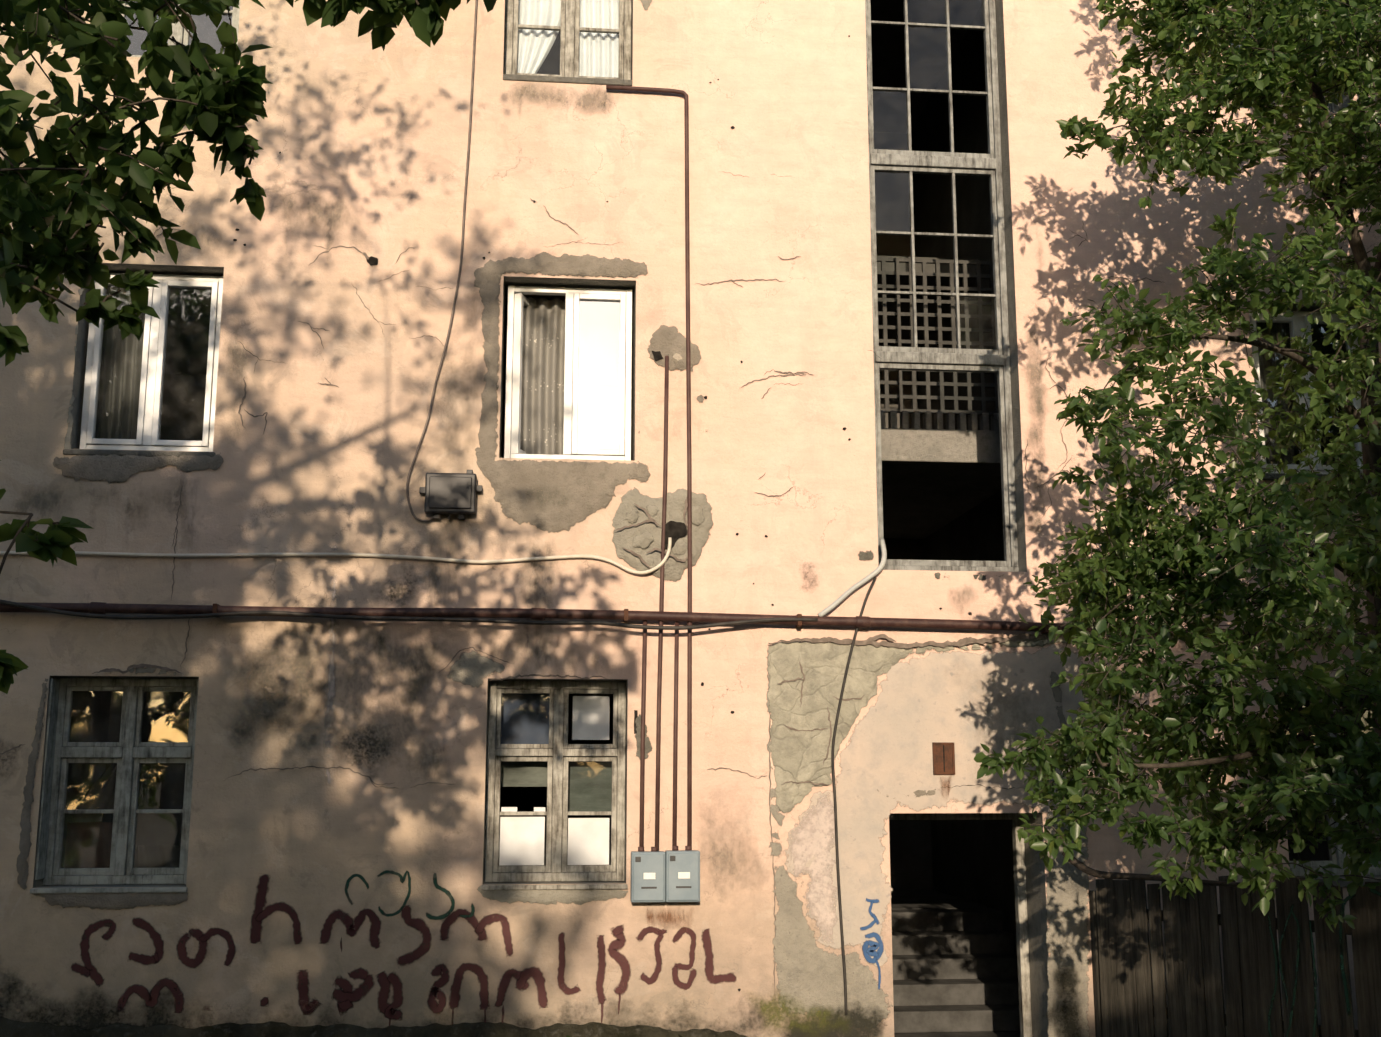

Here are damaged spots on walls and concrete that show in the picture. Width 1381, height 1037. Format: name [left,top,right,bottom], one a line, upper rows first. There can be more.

crack [309,245,362,265]
crack [353,247,453,344]
crack [699,256,801,287]
crack [238,341,270,434]
crack [299,321,338,387]
crack [741,370,813,399]
peeling [447,651,505,688]
crack [224,766,452,789]
peeling [766,635,1091,1037]
water stain [1047,969,1081,1037]